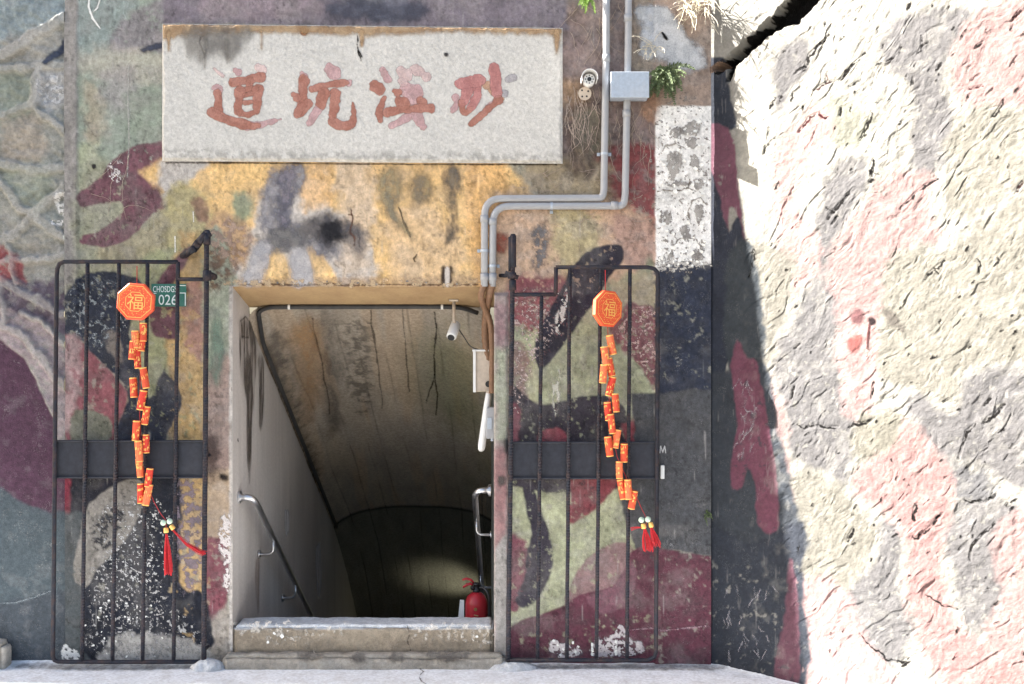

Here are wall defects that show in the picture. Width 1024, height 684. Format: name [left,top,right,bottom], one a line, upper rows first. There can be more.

leakage [187,27,251,60]
leakage [243,164,364,288]
peeling [649,96,712,278]
crack [238,207,478,411]
leakage [240,319,300,463]